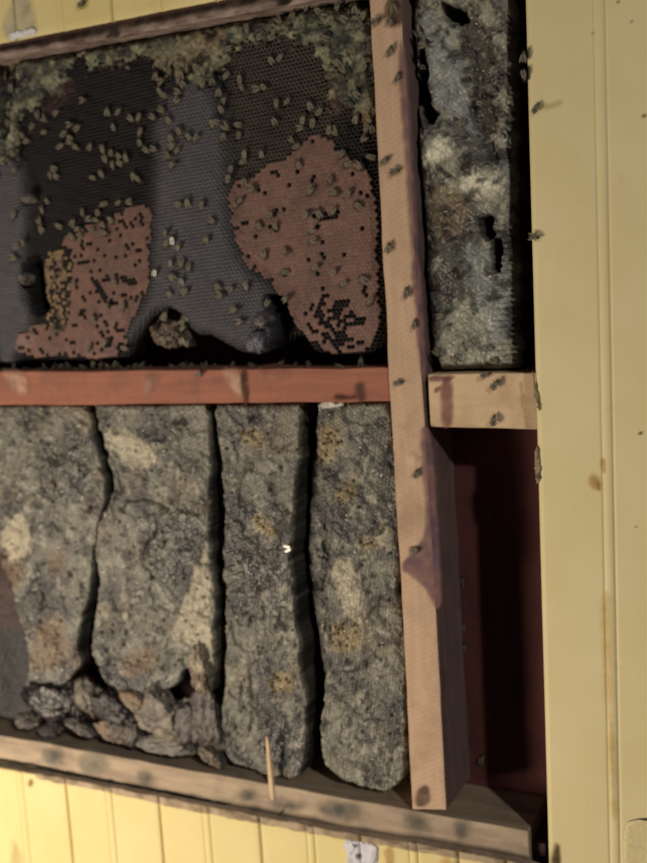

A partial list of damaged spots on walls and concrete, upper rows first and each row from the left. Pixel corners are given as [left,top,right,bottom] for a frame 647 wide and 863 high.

spalling [36,774,512,863]